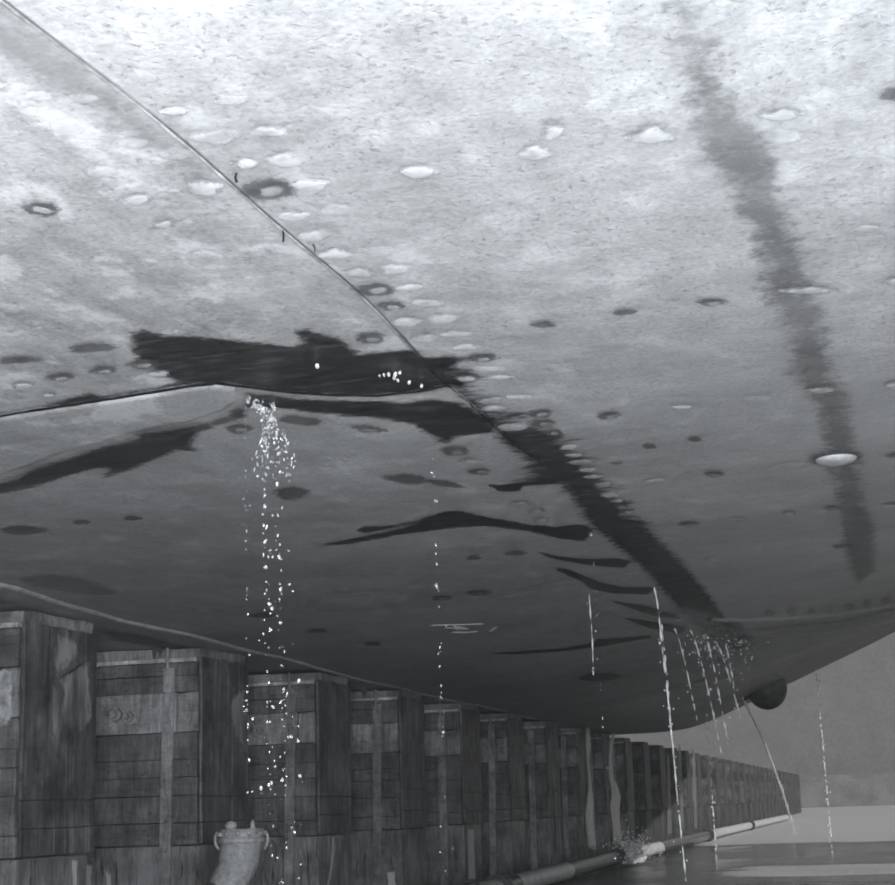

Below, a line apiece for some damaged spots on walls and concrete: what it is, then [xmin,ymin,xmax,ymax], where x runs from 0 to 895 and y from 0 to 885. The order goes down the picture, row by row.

crack [0,367,540,475]
water stain [0,330,744,885]